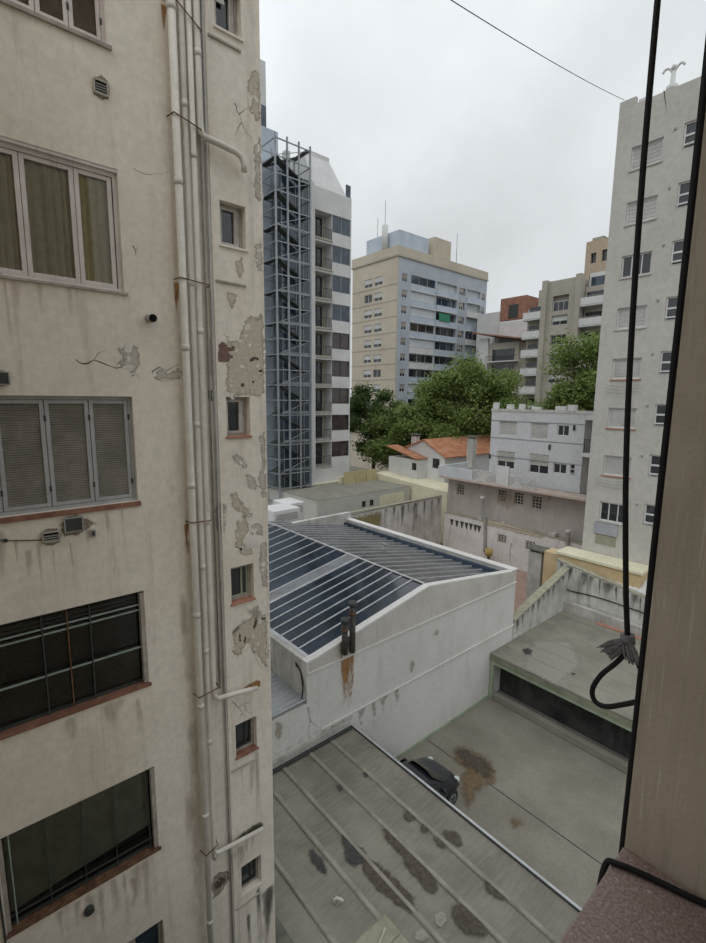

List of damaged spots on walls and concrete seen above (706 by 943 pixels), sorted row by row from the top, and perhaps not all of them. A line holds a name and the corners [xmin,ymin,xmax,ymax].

peeling [247,70,262,121]
crack [76,351,180,381]
spalling [218,310,266,399]
peeling [229,432,270,590]
spalling [232,611,269,667]
rust [341,649,354,692]
damp [342,835,415,913]
damp [383,829,438,893]
damp [435,904,488,936]